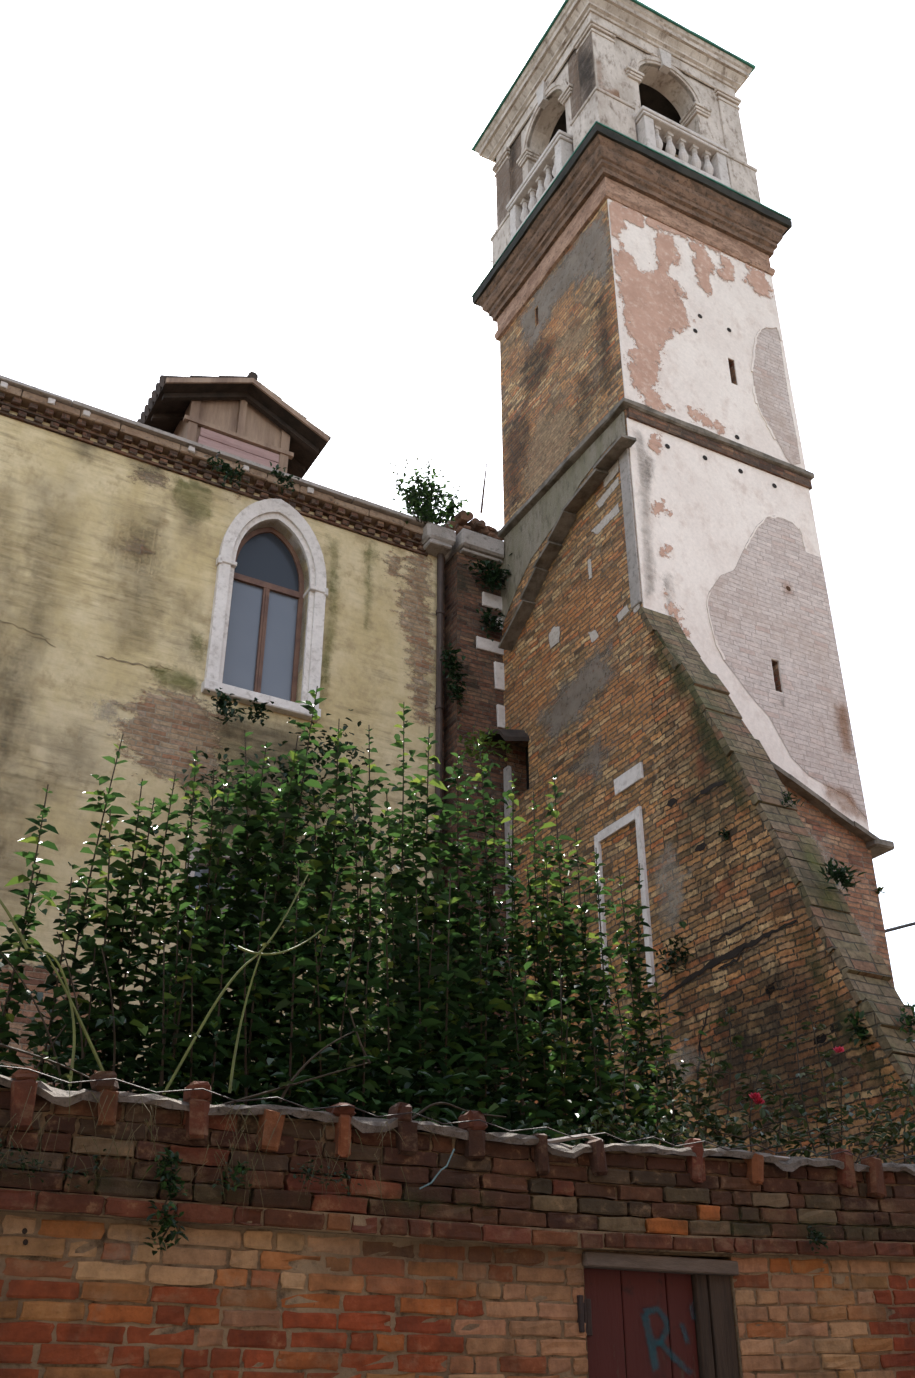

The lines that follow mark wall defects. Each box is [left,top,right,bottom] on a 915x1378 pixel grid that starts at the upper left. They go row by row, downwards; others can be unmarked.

flaking render [521,201,774,439]
peeling [500,408,626,625]
flaking render [648,433,670,456]
flaking render [649,498,673,517]
flaking render [751,326,800,465]
flaking render [383,551,436,726]
flaking render [549,626,560,649]
flaking render [617,604,640,622]
flaking render [706,515,868,820]
flaking render [108,681,231,795]